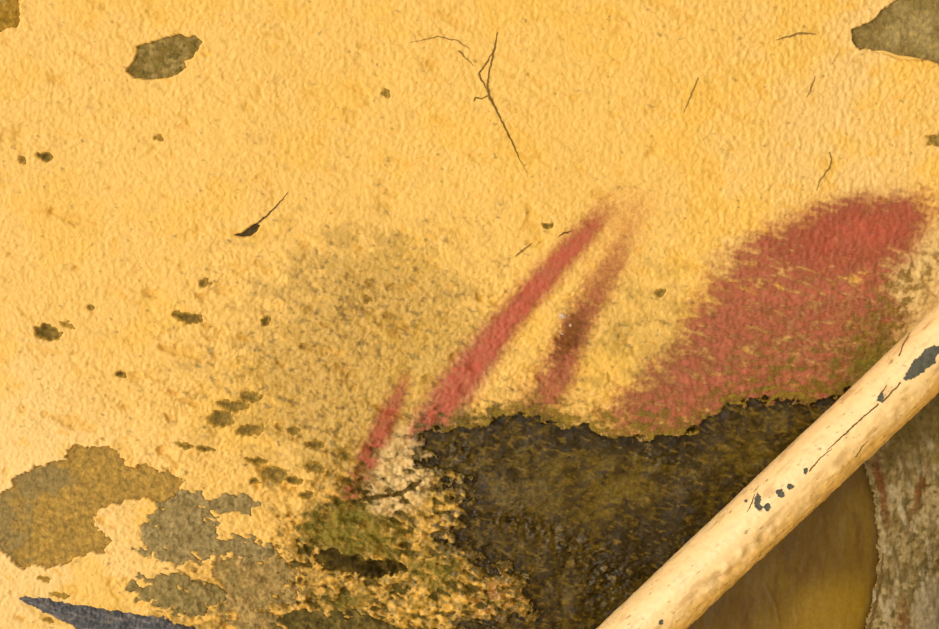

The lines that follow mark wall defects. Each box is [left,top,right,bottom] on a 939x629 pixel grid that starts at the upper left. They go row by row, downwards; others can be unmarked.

peeling [0,0,20,32]
peeling [127,34,202,80]
crack [410,32,527,172]
peeling [851,0,939,64]
flaking render [206,391,264,437]
peeling [0,426,412,629]
water stain [397,369,848,629]
flaking render [414,386,851,629]
water stain [687,464,880,629]
spalling [863,393,939,629]